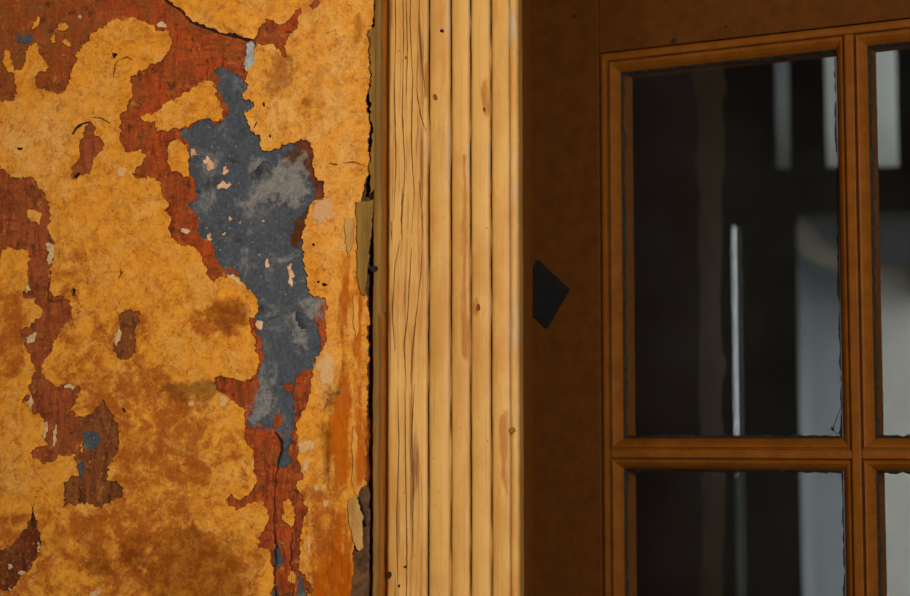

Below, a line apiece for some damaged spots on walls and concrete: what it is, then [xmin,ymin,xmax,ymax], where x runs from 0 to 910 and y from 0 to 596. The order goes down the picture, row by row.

spalling [0,0,335,596]
rust [339,273,363,366]
peeling [344,200,374,338]
rust [327,373,367,485]
rust [311,511,352,596]
spalling [348,426,372,596]